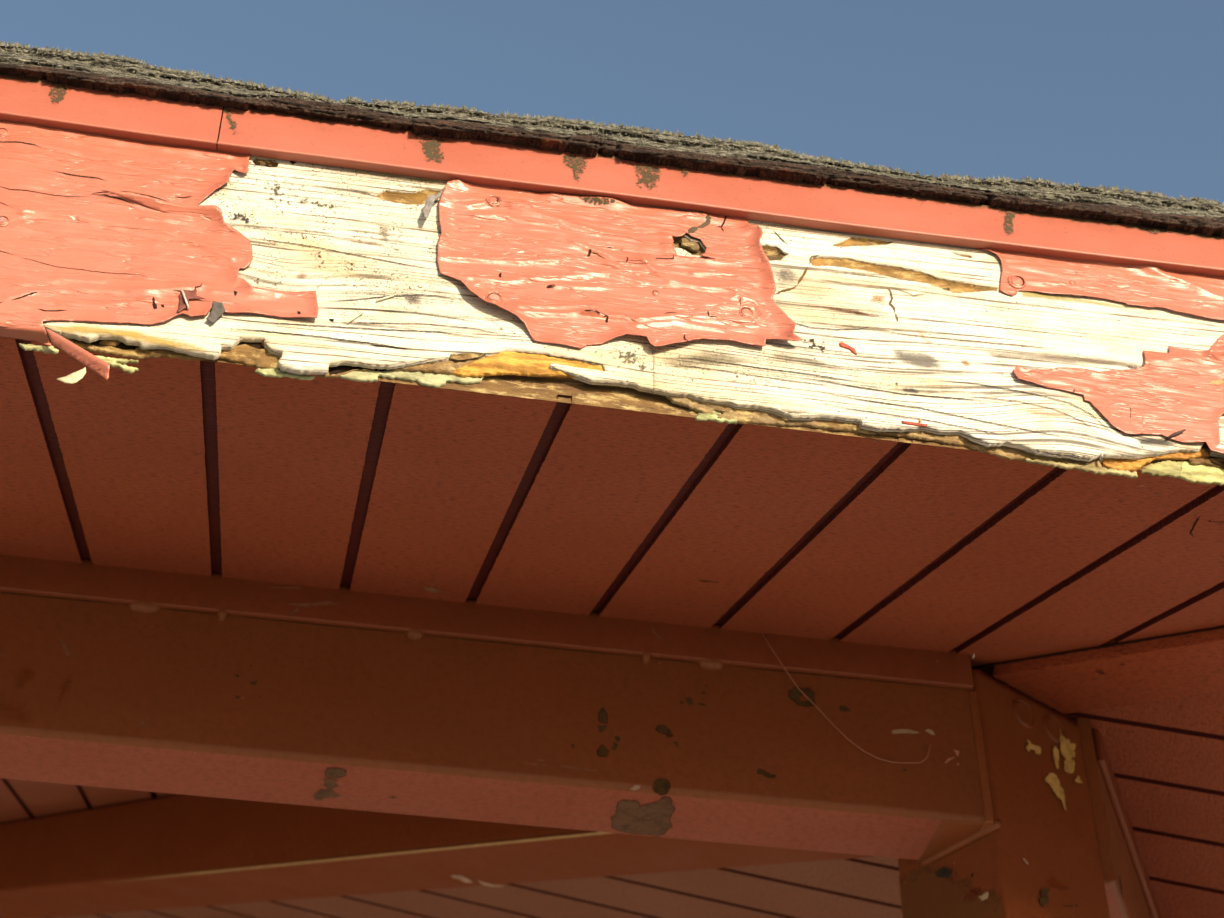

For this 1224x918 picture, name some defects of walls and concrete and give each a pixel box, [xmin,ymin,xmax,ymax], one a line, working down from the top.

crack [0,171,192,206]
crack [0,292,65,311]
crack [0,251,202,304]
peeling [0,120,1224,487]
peeling [313,768,347,800]
peeling [610,778,675,837]
peeling [1026,731,1083,810]